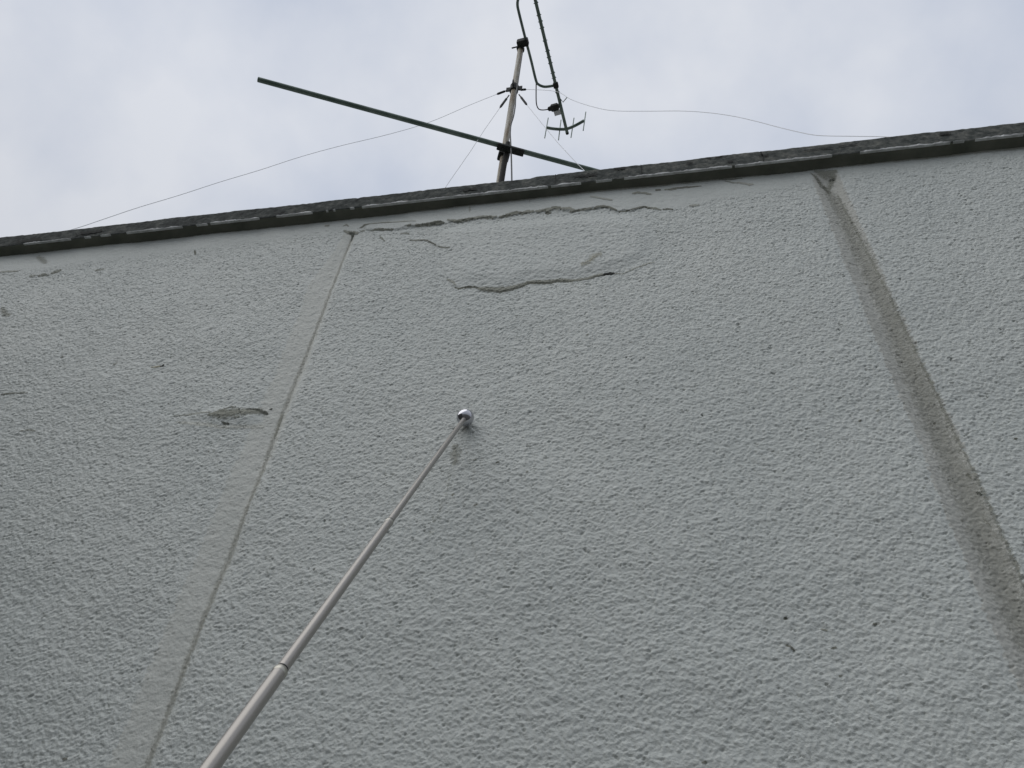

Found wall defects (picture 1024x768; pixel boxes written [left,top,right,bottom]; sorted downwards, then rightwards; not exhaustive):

crack [343,151,764,248]
crack [447,262,654,293]
spalling [208,407,272,425]
leakage [810,169,1024,655]